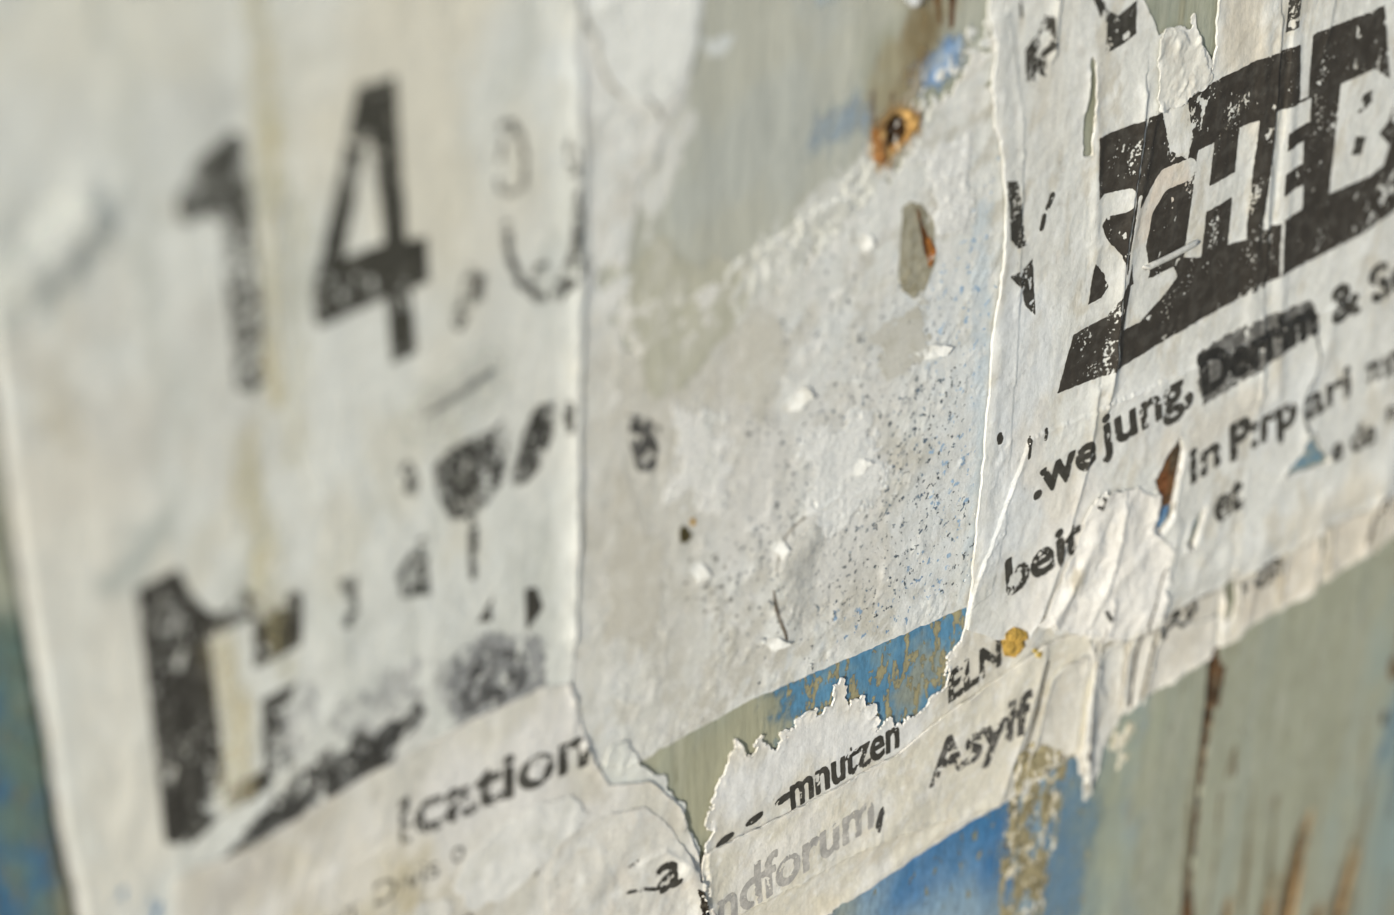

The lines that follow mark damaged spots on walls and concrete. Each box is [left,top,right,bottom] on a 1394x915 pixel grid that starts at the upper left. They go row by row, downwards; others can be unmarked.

rust [934,0,956,28]
rust [869,63,921,170]
peeling [829,742,1075,915]
crack [1181,646,1243,915]